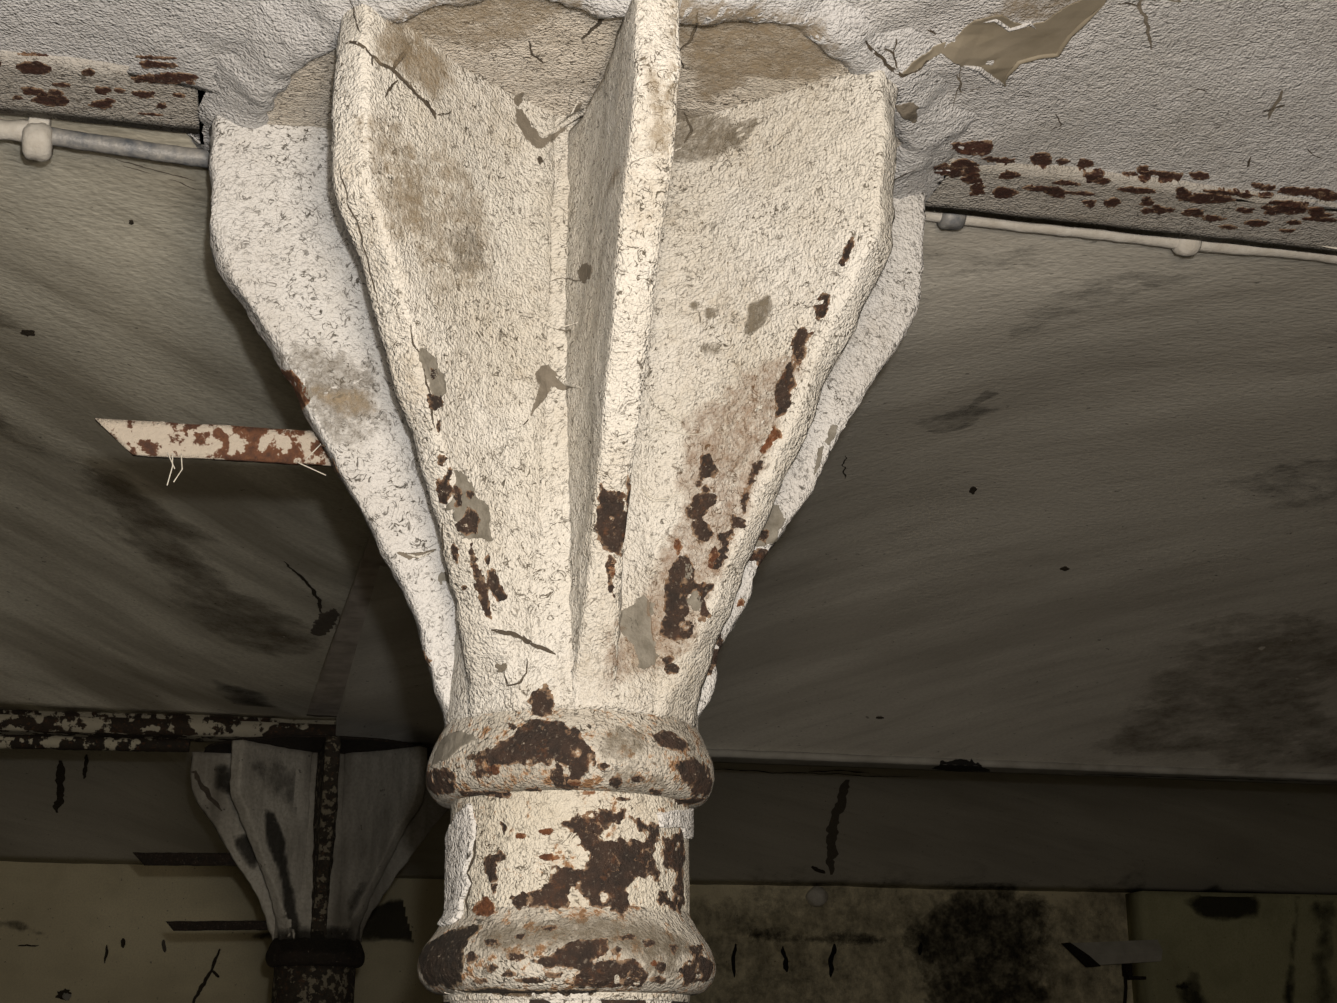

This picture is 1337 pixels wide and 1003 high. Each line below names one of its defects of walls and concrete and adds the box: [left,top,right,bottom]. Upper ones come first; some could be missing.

rust [0,52,199,116]
crack [345,1,452,119]
peeling [902,0,1183,93]
rust [933,140,1337,233]
rust [838,237,855,267]
rust [659,292,830,676]
rust [436,467,508,620]
rust [418,683,713,997]